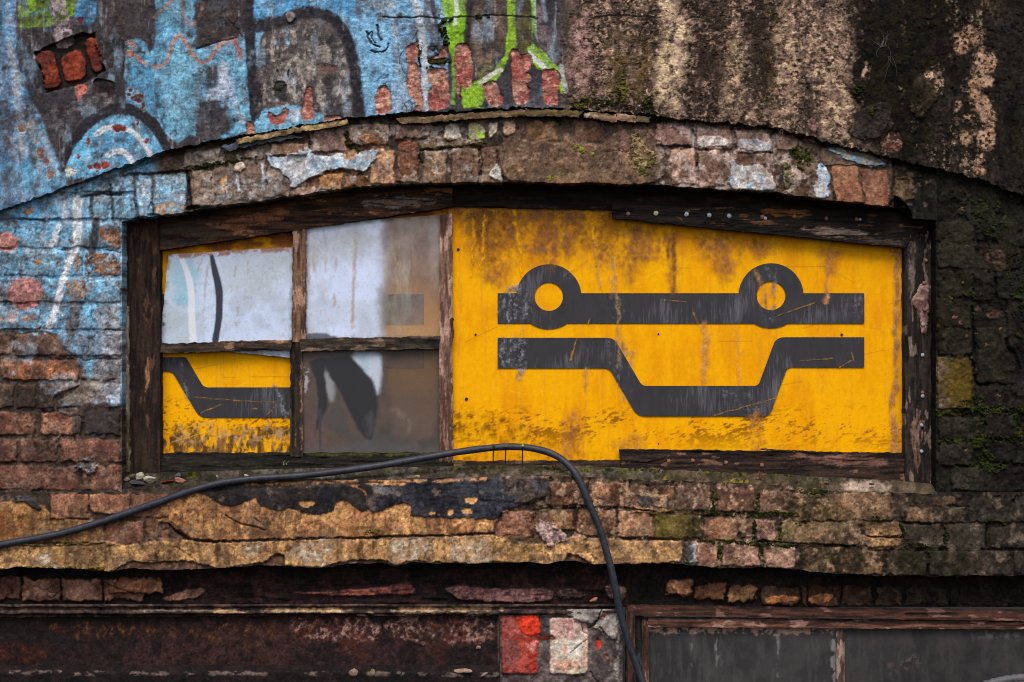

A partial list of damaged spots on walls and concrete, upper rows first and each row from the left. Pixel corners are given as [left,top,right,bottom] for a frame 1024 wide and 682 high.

spalling [34,0,145,133]
spalling [375,85,393,114]
spalling [405,40,561,111]
water stain [565,12,592,97]
water stain [606,0,954,154]
peeling [77,137,110,170]
peeling [265,134,387,196]
peeling [11,495,41,510]
spalling [123,472,186,485]
peeling [197,474,551,538]
spalling [114,561,196,570]